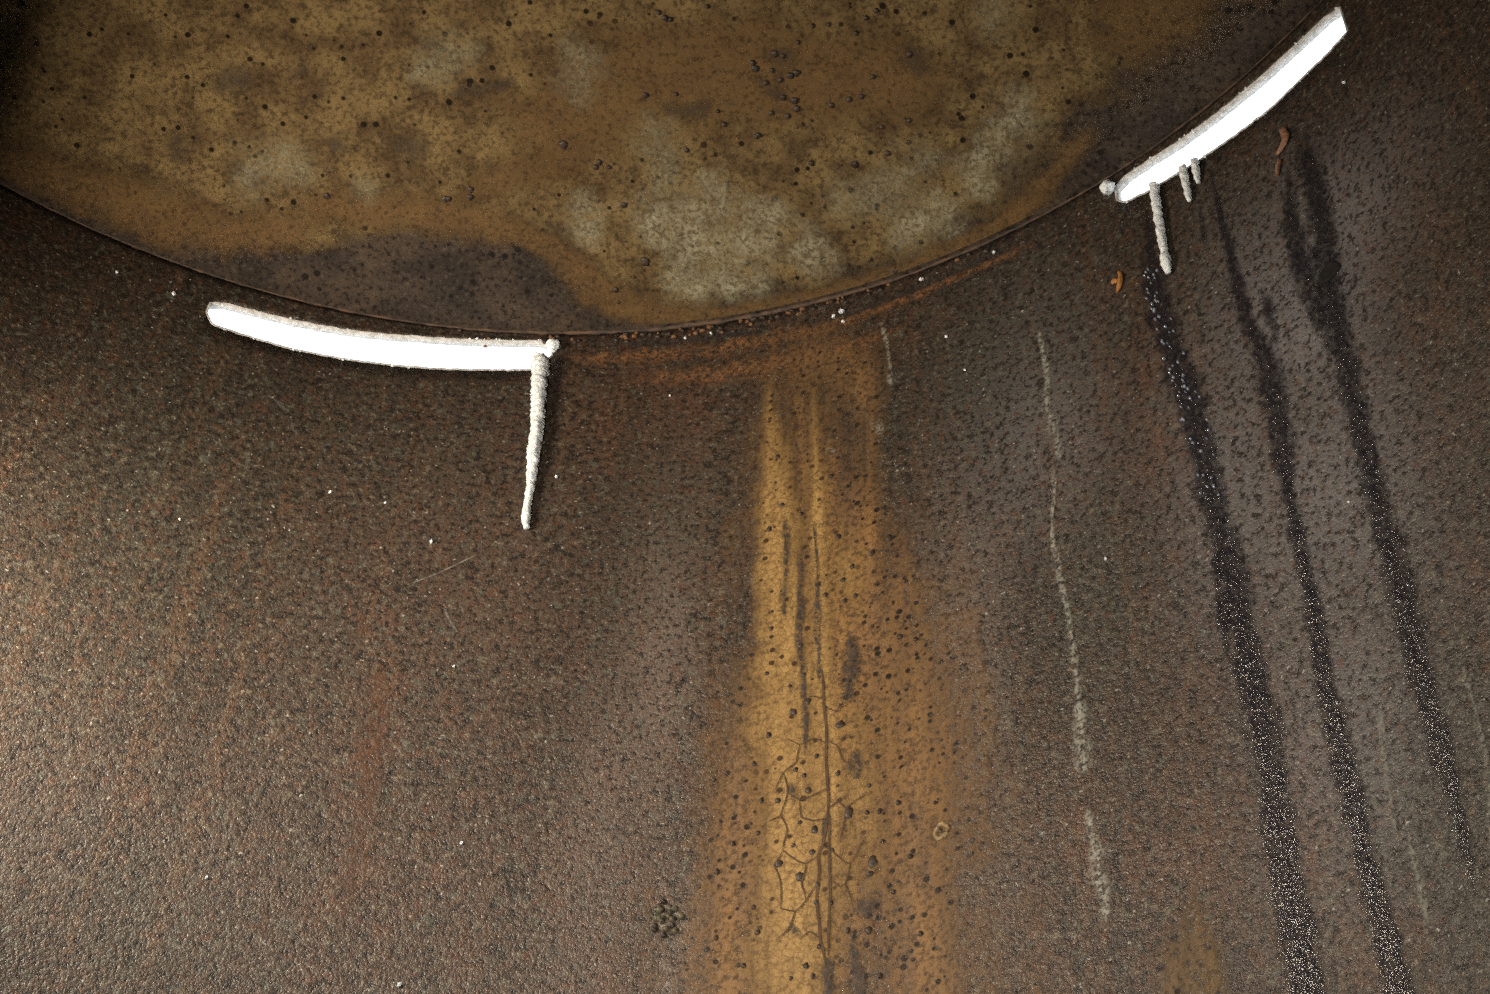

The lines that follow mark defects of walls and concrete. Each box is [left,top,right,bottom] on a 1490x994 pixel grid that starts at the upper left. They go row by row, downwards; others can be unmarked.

corrosion [0,0,1207,419]
crack [769,668,867,965]
corrosion [701,398,957,994]
leakage [1140,212,1323,994]
corrosion [1275,127,1290,177]
leakage [1200,169,1414,994]
leakage [1280,129,1473,880]